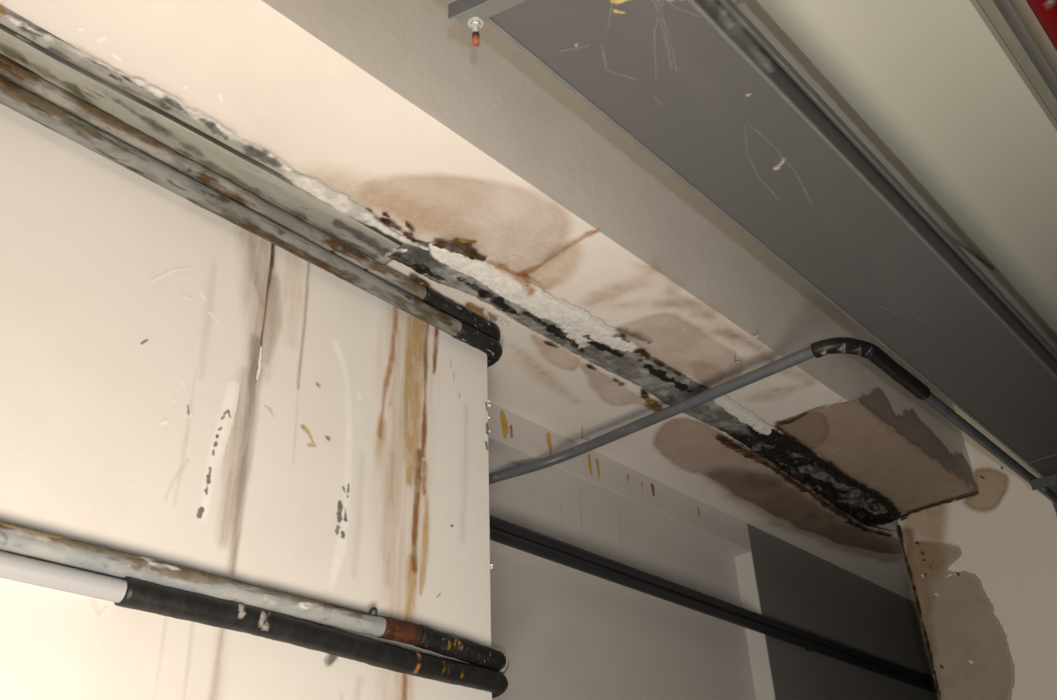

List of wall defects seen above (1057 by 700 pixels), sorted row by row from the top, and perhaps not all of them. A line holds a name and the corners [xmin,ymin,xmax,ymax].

corrosion [0,54,158,146]
corrosion [189,200,358,281]
corrosion [365,209,420,243]
water stain [409,274,436,292]
corrosion [433,239,486,261]
corrosion [497,264,539,294]
corrosion [325,238,452,618]
water stain [584,365,624,386]
water stain [640,390,662,412]
water stain [775,388,1007,541]
water stain [655,419,930,636]
peeling [897,492,1015,700]